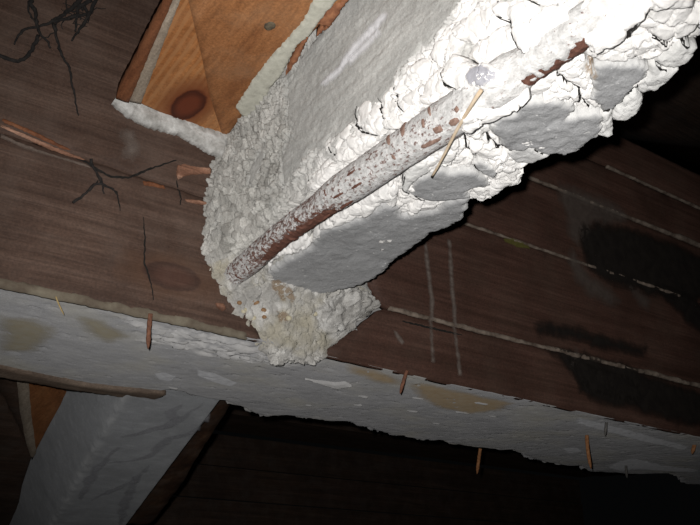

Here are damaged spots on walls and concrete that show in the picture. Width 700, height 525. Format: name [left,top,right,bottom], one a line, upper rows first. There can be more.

crack [496,1,525,54]
crack [652,35,690,72]
crack [556,70,610,112]
crack [354,106,378,136]
crack [486,132,502,148]
crack [51,145,177,211]
crack [143,217,154,300]
damp [563,192,700,330]
damp [537,322,646,355]
damp [552,351,700,425]